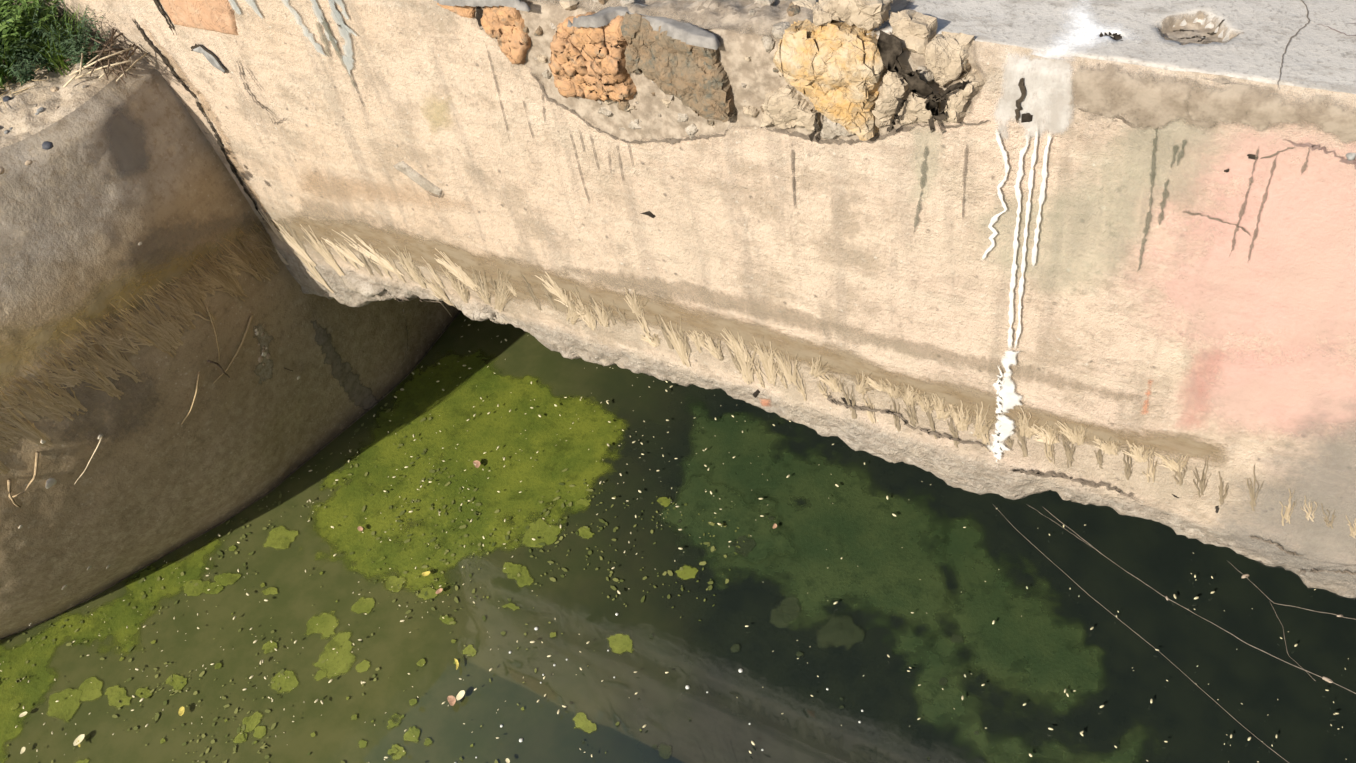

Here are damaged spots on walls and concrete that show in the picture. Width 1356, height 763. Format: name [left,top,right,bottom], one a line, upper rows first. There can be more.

crack [132,0,264,221]
crack [236,61,285,125]
spalling [437,0,986,145]
crack [1277,0,1356,84]
crack [1261,140,1356,169]
water stain [0,0,1223,462]
crack [1183,211,1250,235]